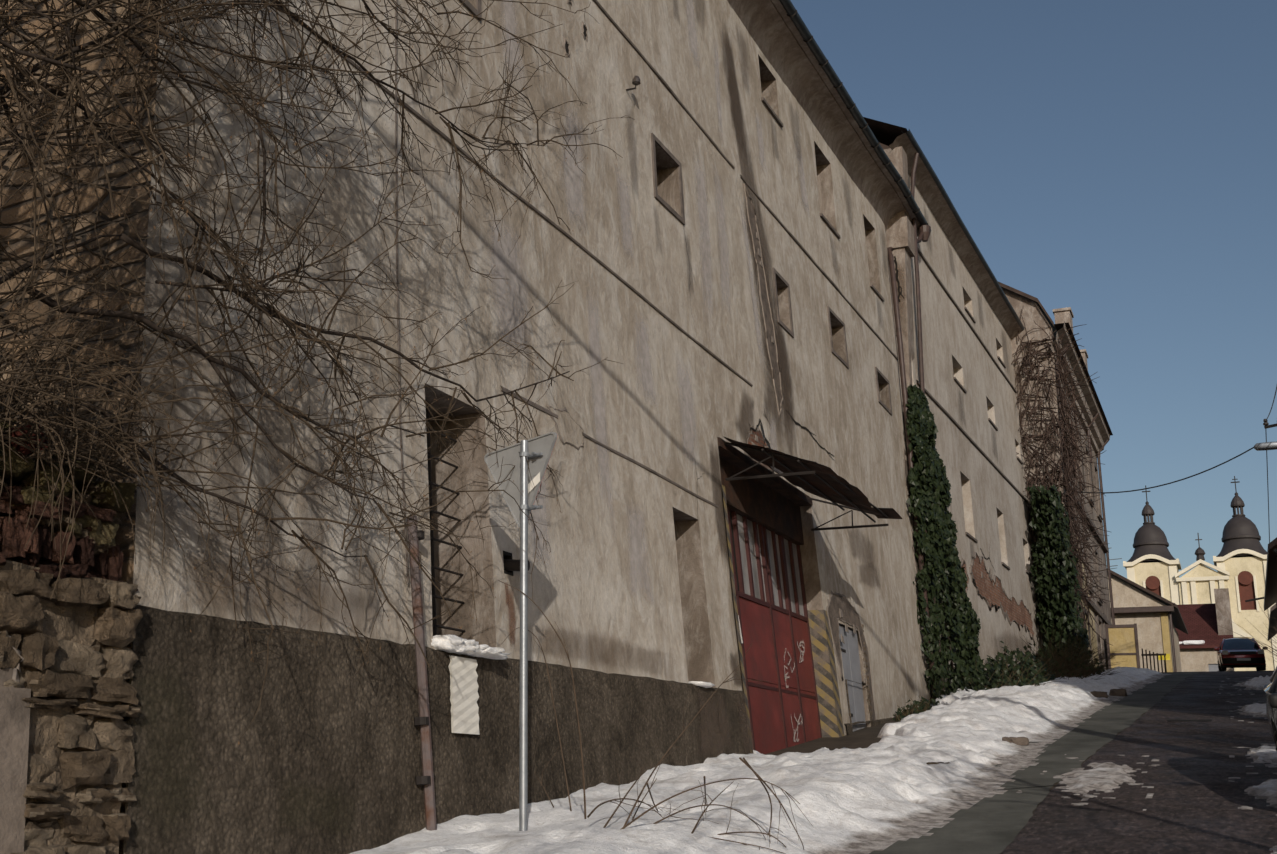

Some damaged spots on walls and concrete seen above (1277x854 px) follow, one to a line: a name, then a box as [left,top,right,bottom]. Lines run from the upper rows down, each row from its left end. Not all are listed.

damp [725,39,792,443]
spalling [961,551,1036,646]